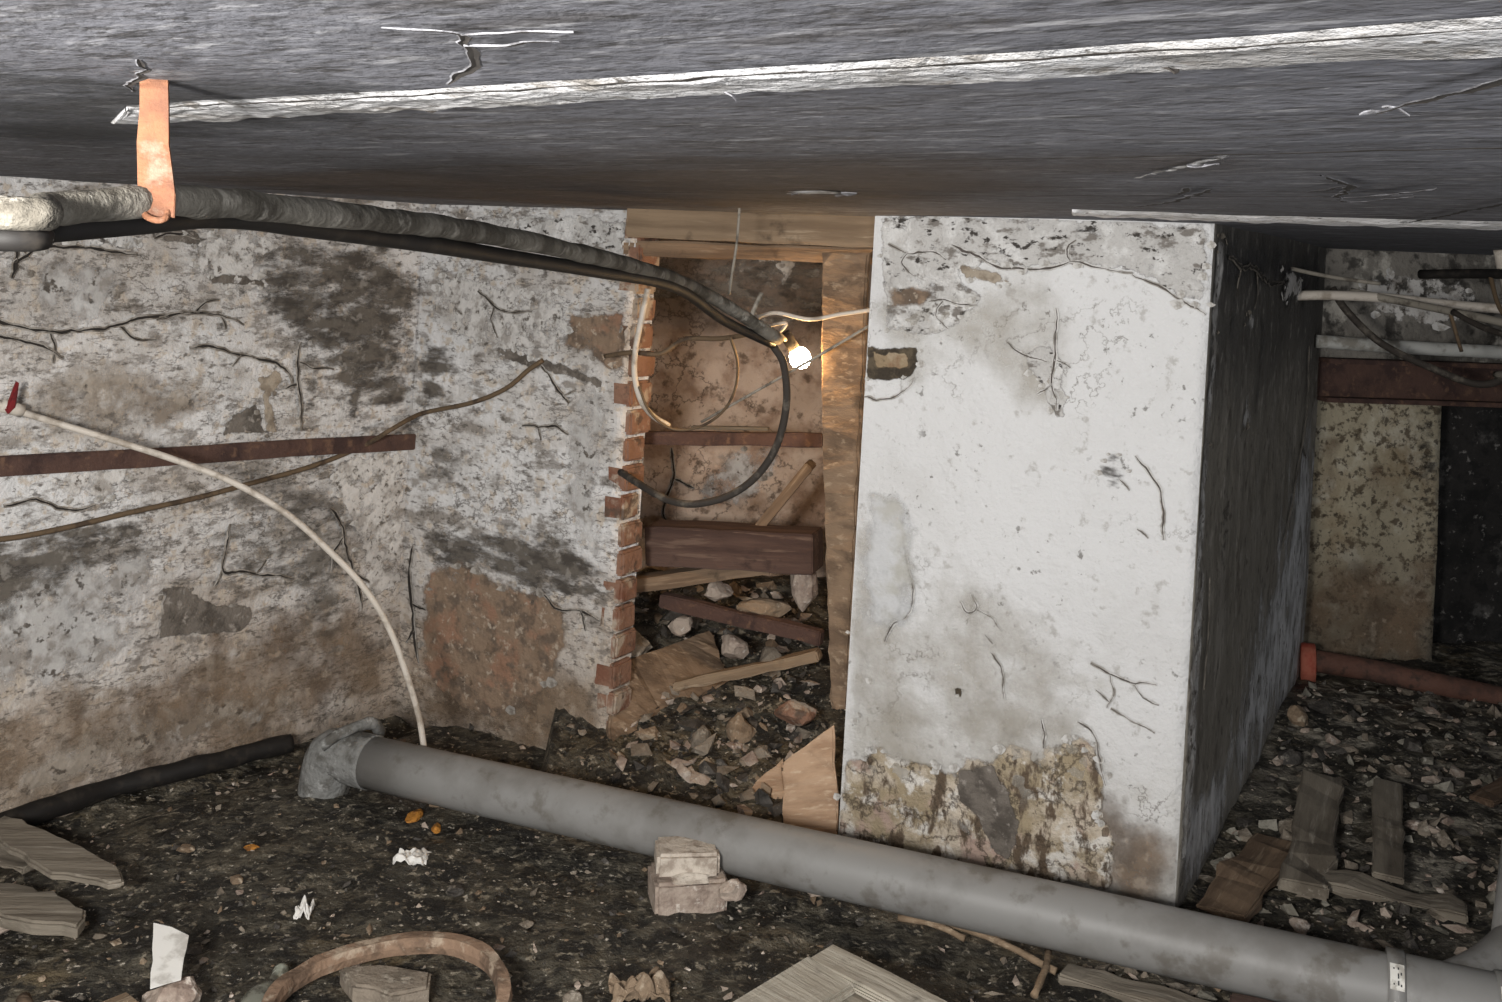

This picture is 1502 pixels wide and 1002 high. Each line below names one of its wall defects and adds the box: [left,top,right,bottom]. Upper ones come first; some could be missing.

water stain [350,374,363,418]
peeling [330,452,405,605]
peeling [833,216,1313,890]
flaking render [418,562,565,717]